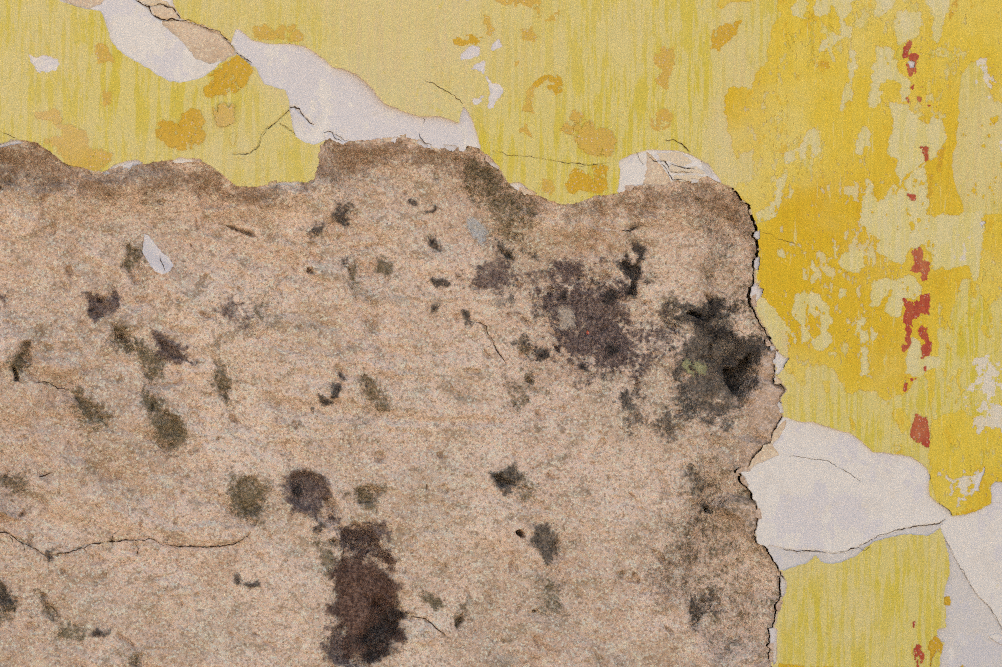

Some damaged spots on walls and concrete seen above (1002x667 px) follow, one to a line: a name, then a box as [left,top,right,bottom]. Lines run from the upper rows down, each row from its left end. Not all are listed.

peeling [790,0,859,112]
damp [0,148,282,204]
damp [300,139,546,214]
peeling [838,0,986,378]
flaking render [0,0,789,667]
damp [431,225,774,442]
peeling [791,289,833,351]
peeling [963,346,1002,438]
crack [0,530,249,556]
damp [282,468,392,561]
peeling [741,417,1002,667]
damp [320,603,407,667]